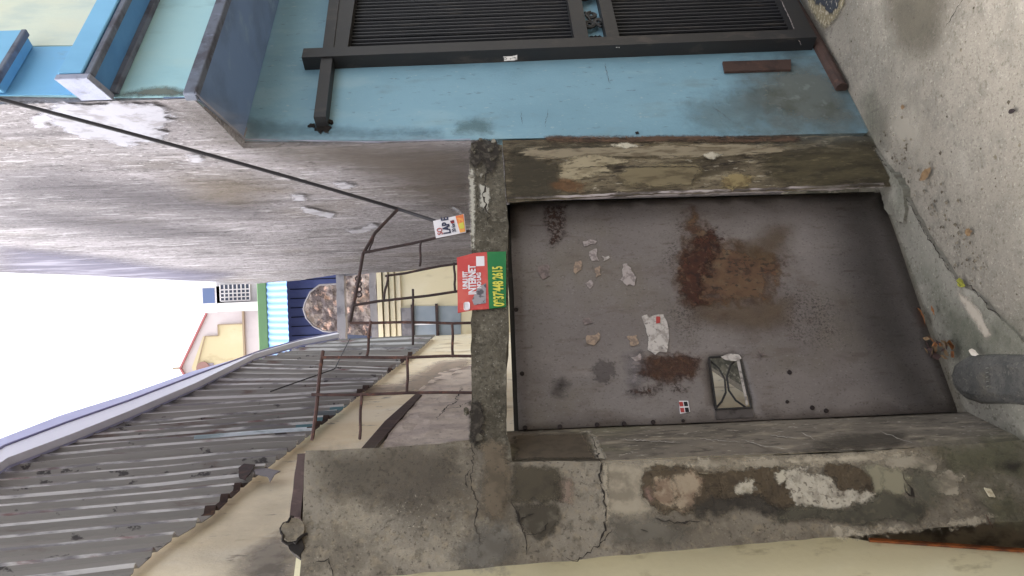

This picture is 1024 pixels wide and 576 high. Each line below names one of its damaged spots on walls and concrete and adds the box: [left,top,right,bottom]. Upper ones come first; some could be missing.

flaking render [519,135,801,187]
rust [673,206,820,325]
crack [905,196,1003,321]
crack [465,441,481,554]
crack [511,501,548,554]
crack [566,435,612,562]
flaking render [606,452,965,516]